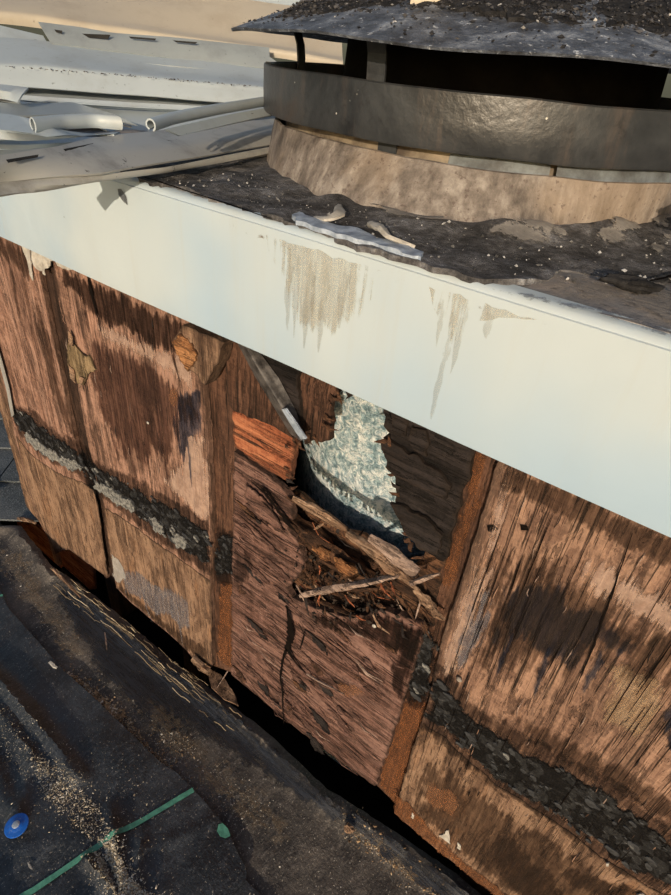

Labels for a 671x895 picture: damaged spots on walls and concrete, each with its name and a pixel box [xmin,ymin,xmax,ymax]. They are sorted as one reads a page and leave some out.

damp [62,270,181,379]
damp [91,341,201,472]
spalling [291,489,407,614]
crack [279,605,306,723]
peeling [305,629,328,656]
damp [458,587,592,694]